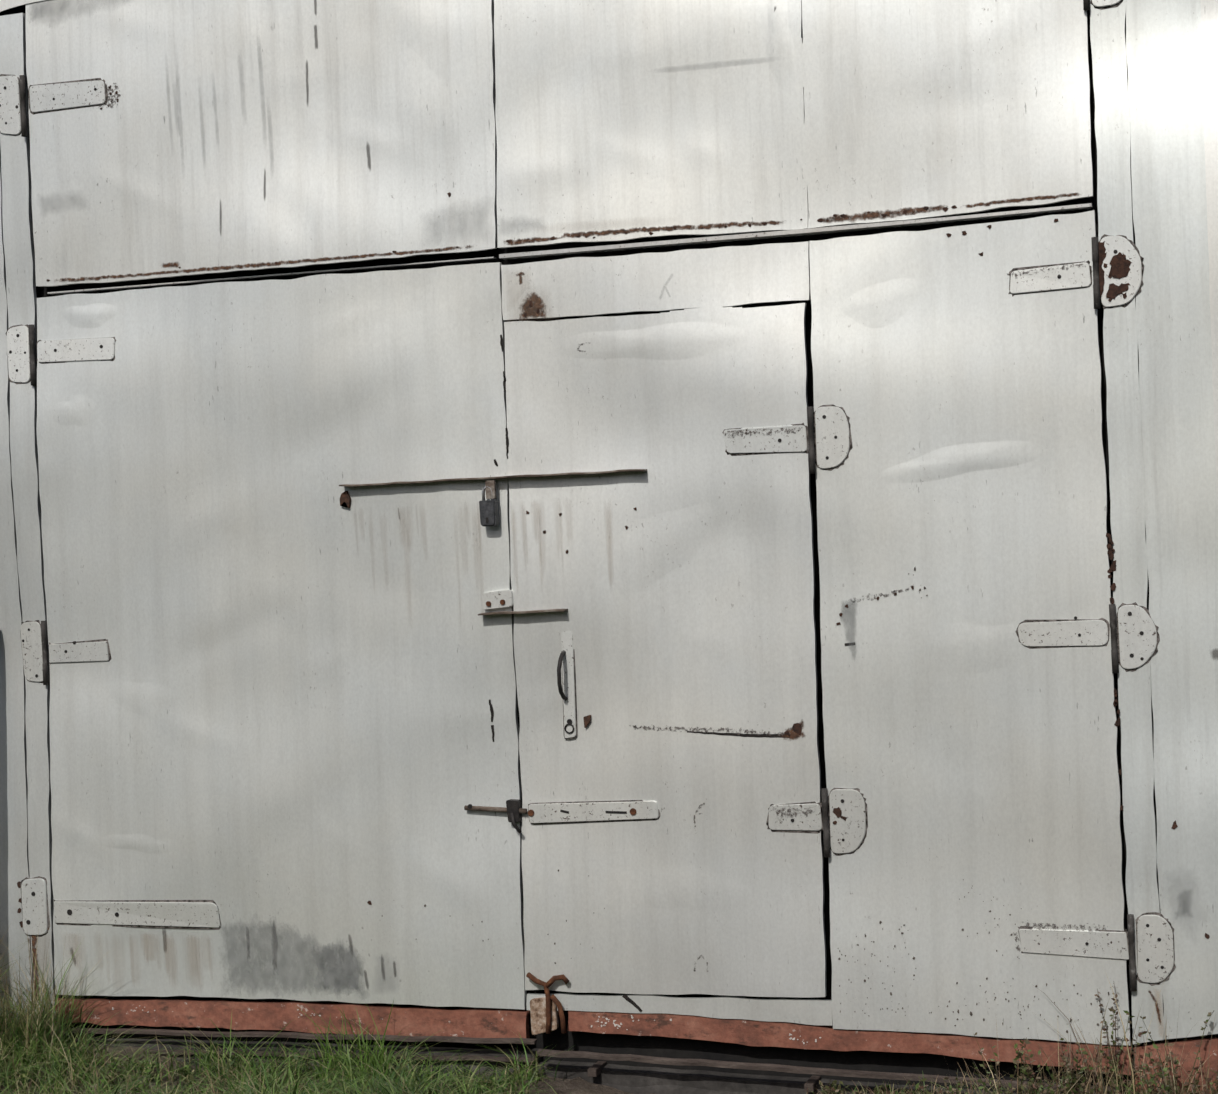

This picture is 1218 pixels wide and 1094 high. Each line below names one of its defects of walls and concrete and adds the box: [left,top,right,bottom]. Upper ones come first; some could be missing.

rust [504,221,780,245]
rust [520,293,545,319]